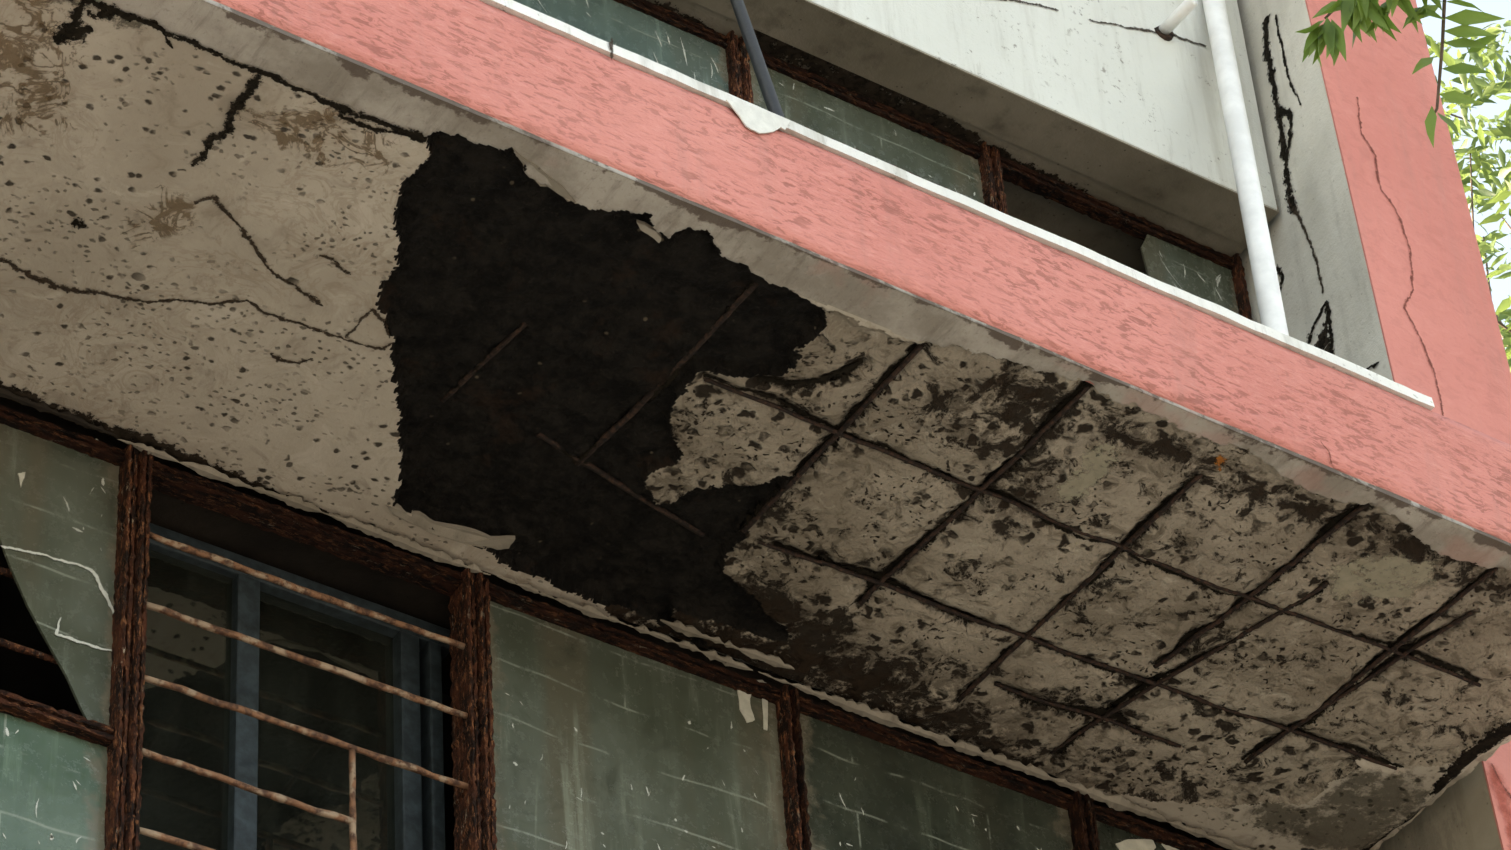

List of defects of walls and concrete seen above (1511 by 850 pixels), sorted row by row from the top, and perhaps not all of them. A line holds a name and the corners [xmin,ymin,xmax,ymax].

crack [0,0,427,365]
crack [1261,14,1379,370]
crack [1357,97,1444,416]
spalling [375,131,1511,809]